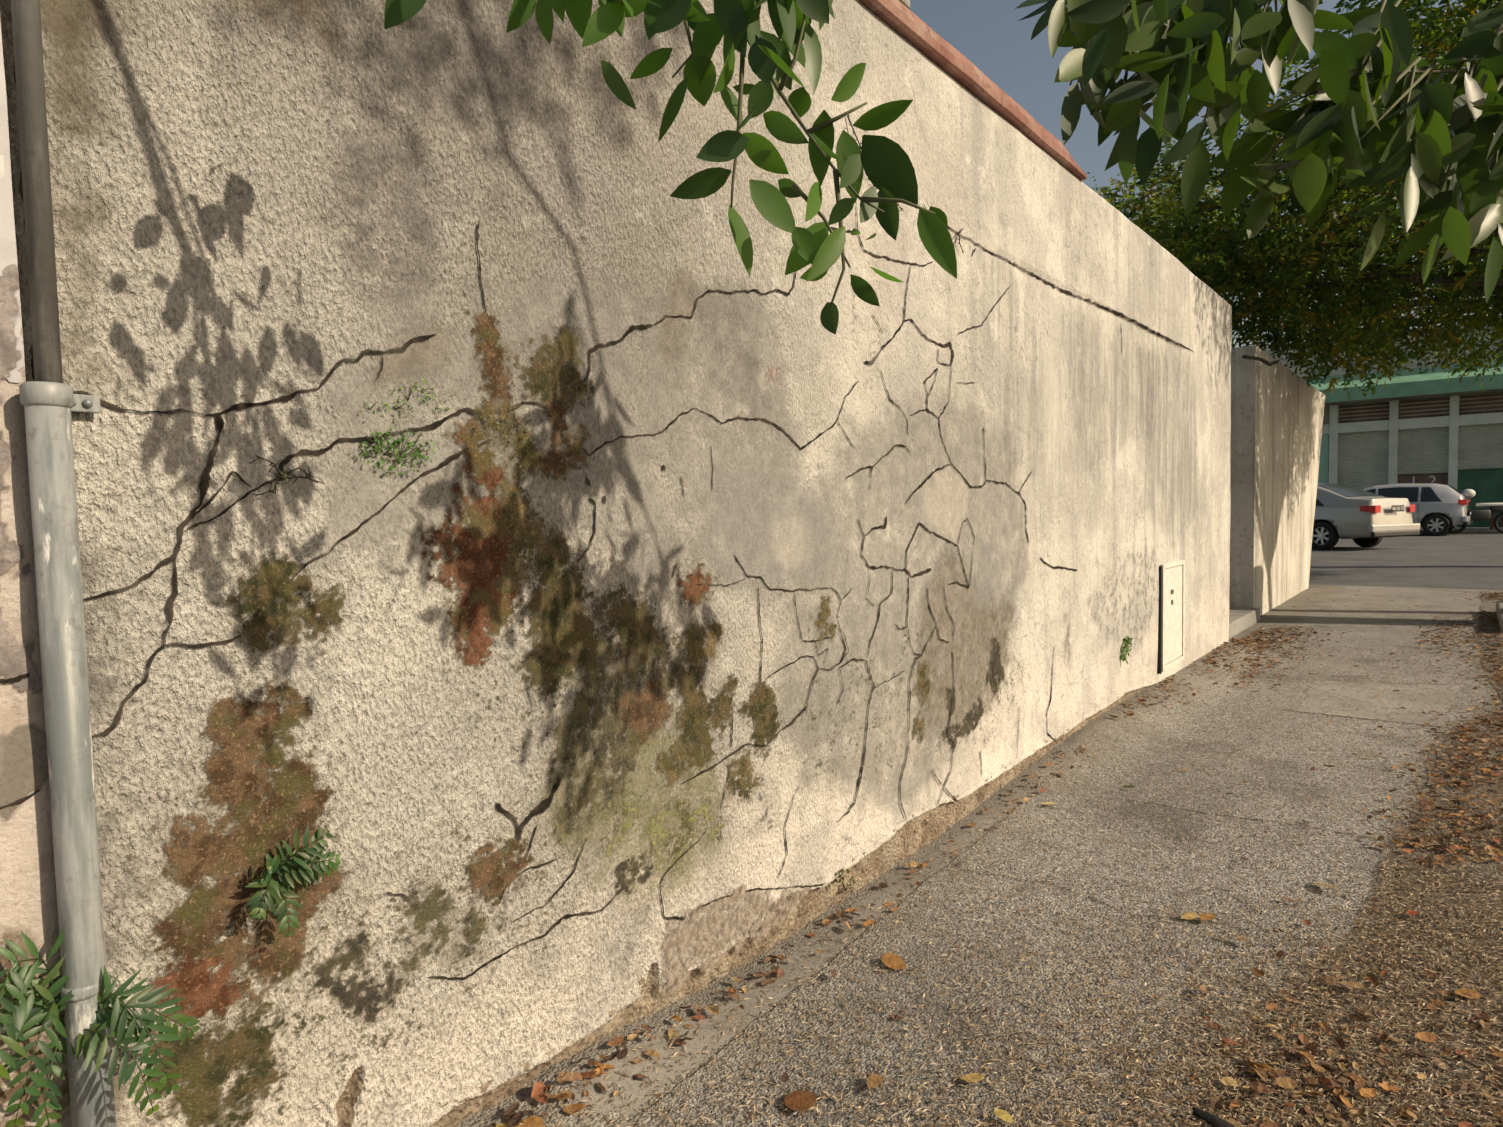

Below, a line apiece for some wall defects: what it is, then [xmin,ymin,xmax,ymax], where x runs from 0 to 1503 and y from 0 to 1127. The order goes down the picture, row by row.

spalling [0,265,21,402]
crack [476,221,486,311]
spalling [0,431,30,575]
crack [0,673,30,684]
crack [0,789,41,809]
spalling [0,608,43,693]
crack [73,272,796,738]
crack [430,778,623,980]
leakage [337,274,791,582]
leakage [472,658,730,846]
crack [576,201,1194,921]
leakage [781,405,1026,801]